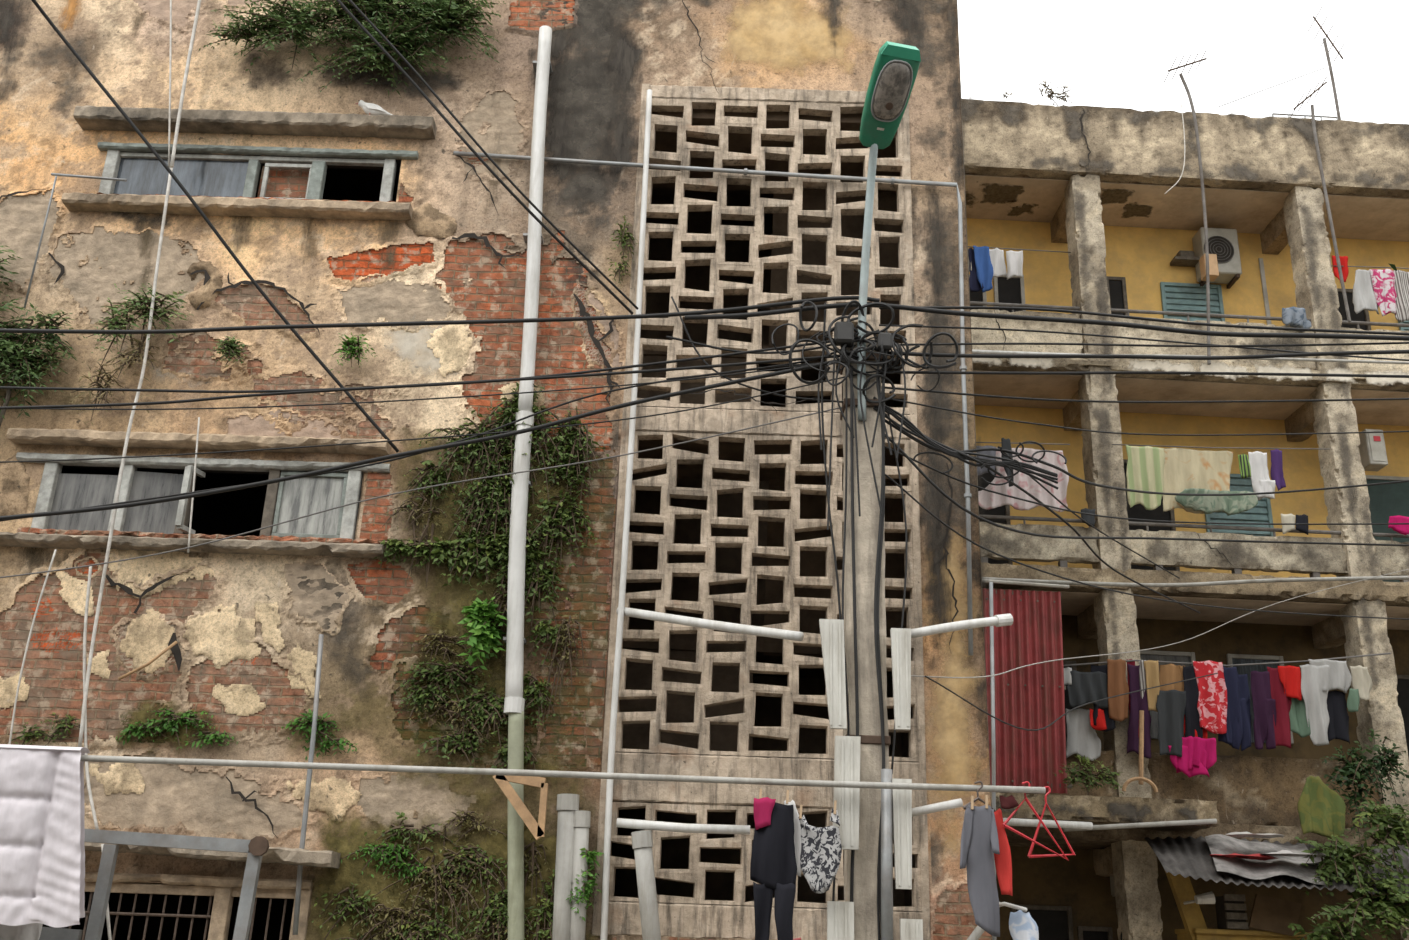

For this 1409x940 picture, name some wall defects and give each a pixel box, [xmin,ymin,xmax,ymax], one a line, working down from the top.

flaking render [503,0,579,38]
water stain [724,0,852,72]
water stain [531,0,662,223]
water stain [892,0,982,185]
crack [1079,109,1091,169]
water stain [1118,110,1159,125]
water stain [1159,118,1258,179]
water stain [1229,110,1314,144]
peeling [965,183,1038,216]
peeling [1100,189,1153,218]
flaking render [0,177,626,847]
crack [226,776,278,838]